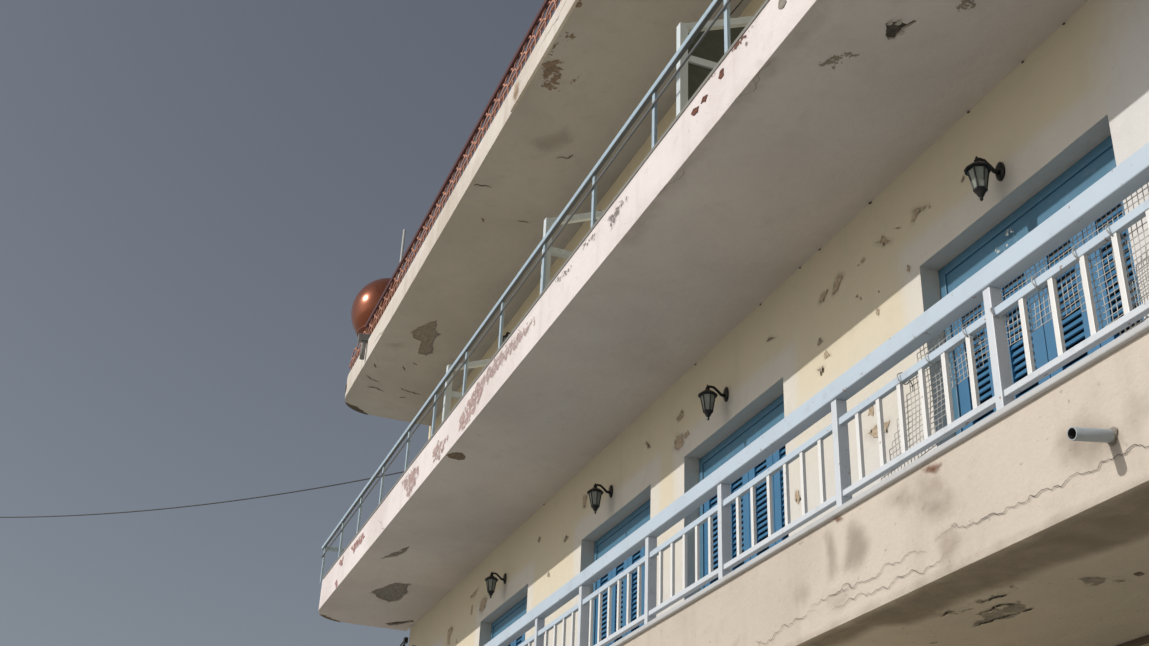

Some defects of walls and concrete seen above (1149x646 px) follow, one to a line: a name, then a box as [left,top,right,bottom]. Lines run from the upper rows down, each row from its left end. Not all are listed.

spalling [886,20,915,38]
peeling [541,32,580,90]
peeling [819,52,859,69]
spalling [411,320,440,356]
peeling [432,317,535,462]
peeling [402,466,419,498]
crack [757,444,1148,646]
spalling [373,583,408,601]
flaking render [946,585,1027,626]